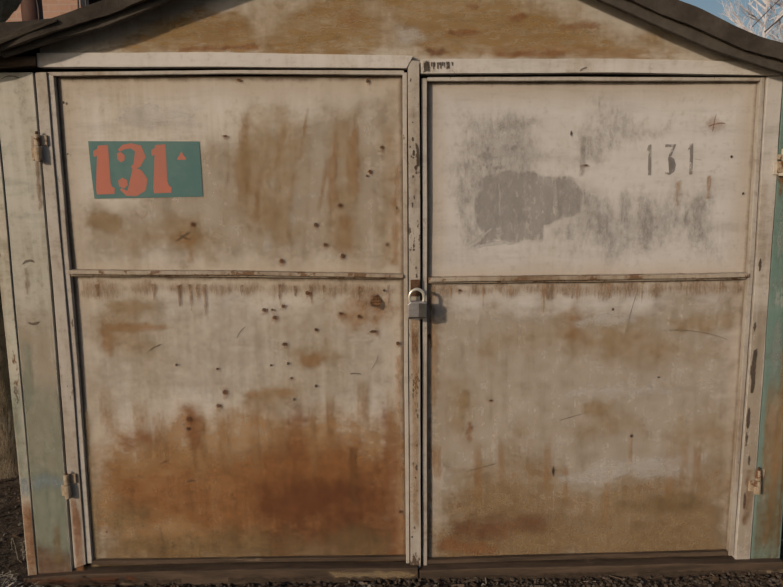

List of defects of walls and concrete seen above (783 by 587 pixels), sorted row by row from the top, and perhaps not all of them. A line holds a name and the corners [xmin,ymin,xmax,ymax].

corrosion [121,0,380,55]
corrosion [383,0,651,59]
peeling [471,160,588,248]